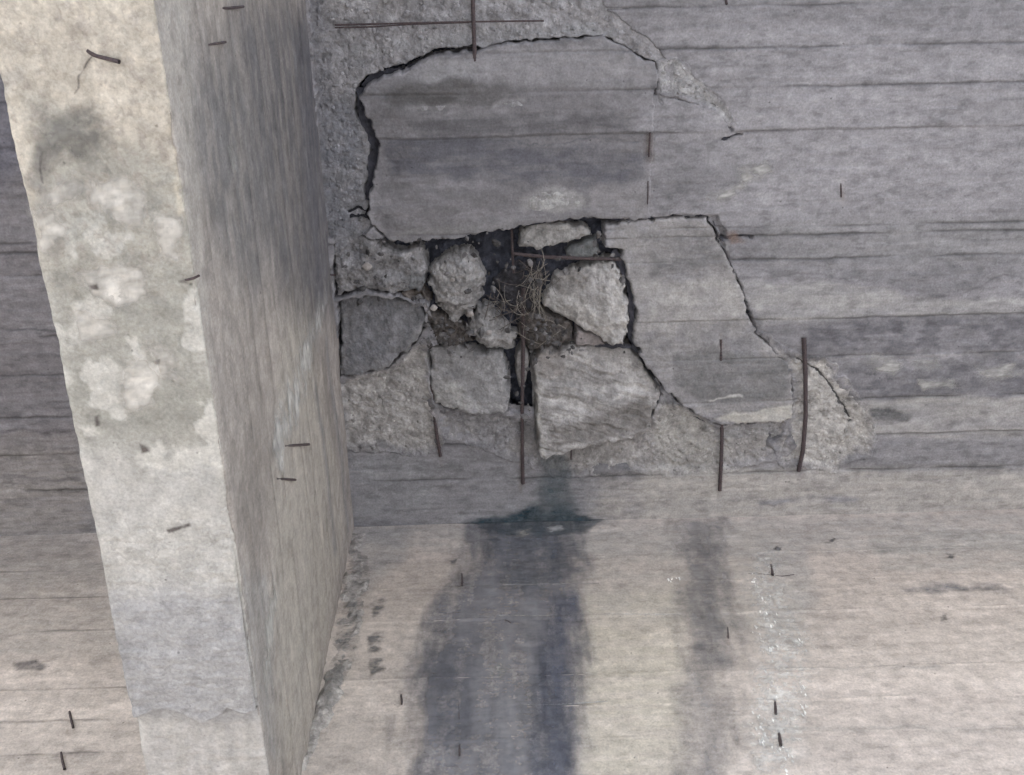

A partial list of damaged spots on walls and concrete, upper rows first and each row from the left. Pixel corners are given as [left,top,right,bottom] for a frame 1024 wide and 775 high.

crack [348,48,480,229]
peeling [310,0,878,480]
crack [484,214,750,252]
crack [595,249,705,422]
crack [796,357,851,422]
leakage [414,458,602,775]